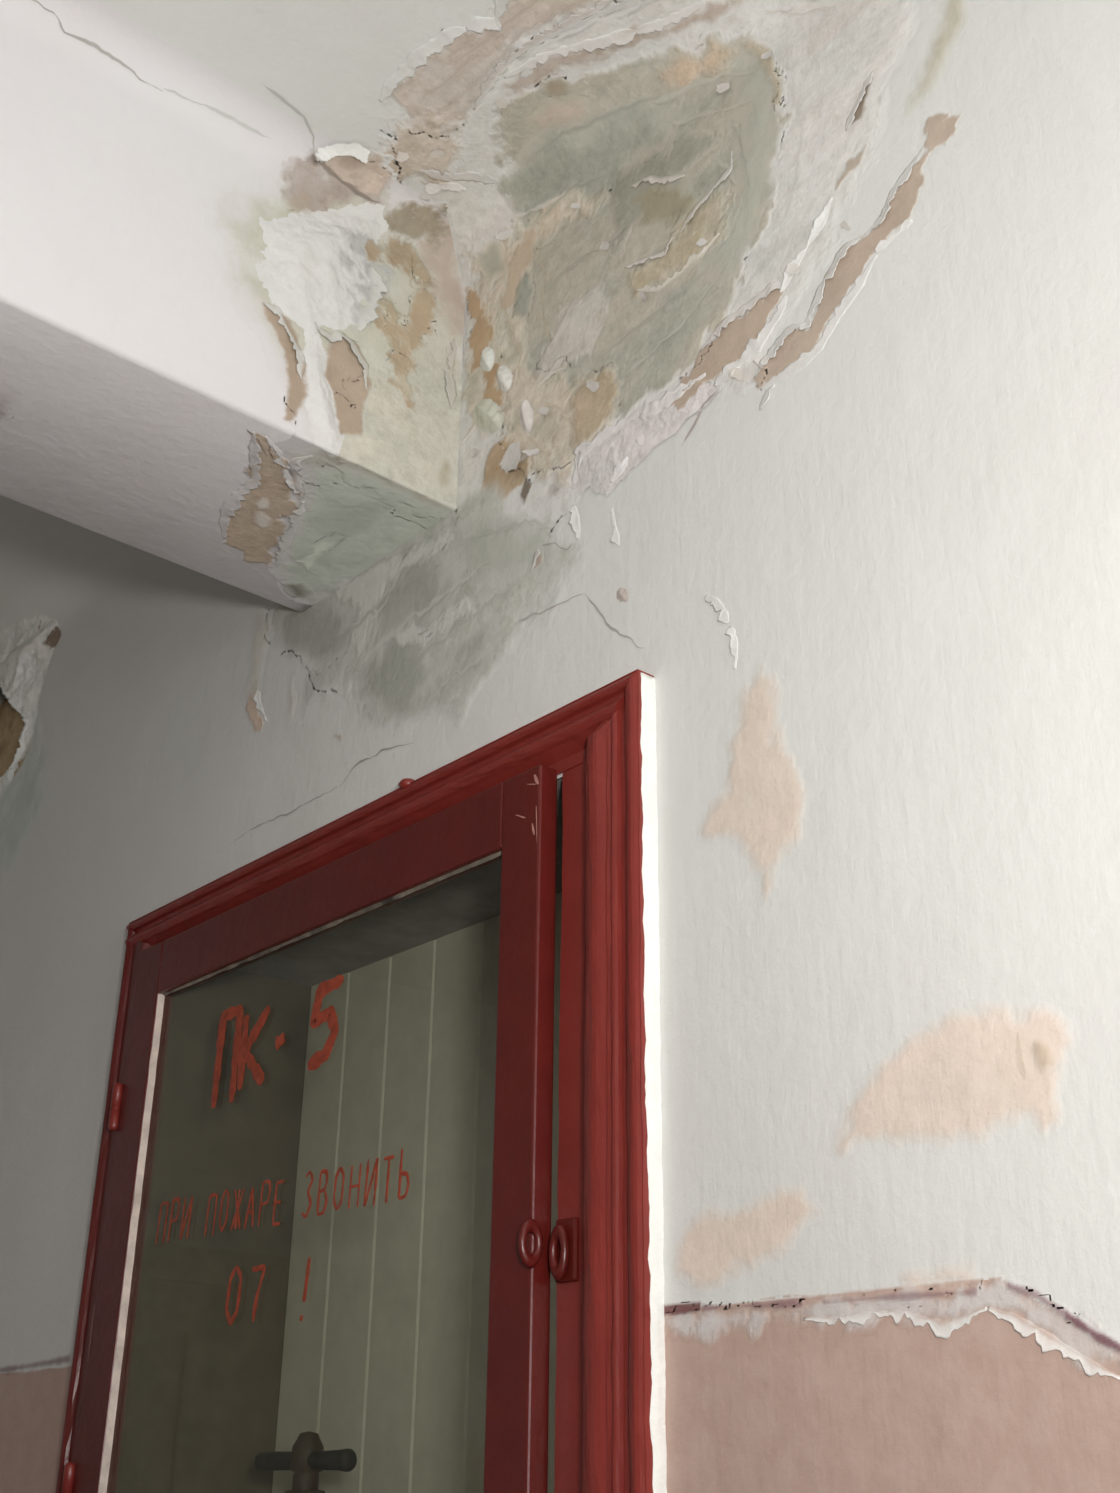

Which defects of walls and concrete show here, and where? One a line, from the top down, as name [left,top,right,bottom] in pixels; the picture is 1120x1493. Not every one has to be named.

crack [33,0,270,139]
crack [265,86,317,161]
peeling [305,0,964,546]
spalling [218,430,313,567]
damp [264,462,596,745]
spalling [0,609,63,790]
peeling [697,595,813,906]
peeling [830,996,1083,1163]
peeling [664,1174,1120,1386]